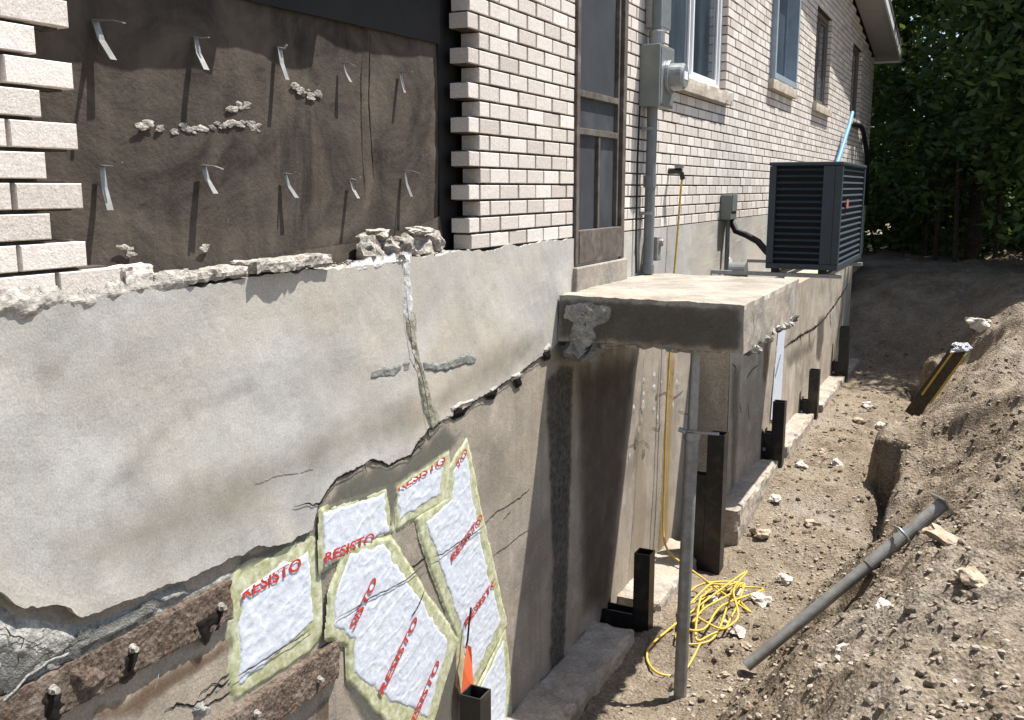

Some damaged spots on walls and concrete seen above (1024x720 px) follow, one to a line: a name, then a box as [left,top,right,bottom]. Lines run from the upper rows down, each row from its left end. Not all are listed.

spalling [109,244,333,286]
spalling [355,226,446,262]
spalling [560,299,728,365]
crack [294,251,551,507]
crack [485,492,530,556]
crack [3,626,91,665]
spalling [0,570,233,701]